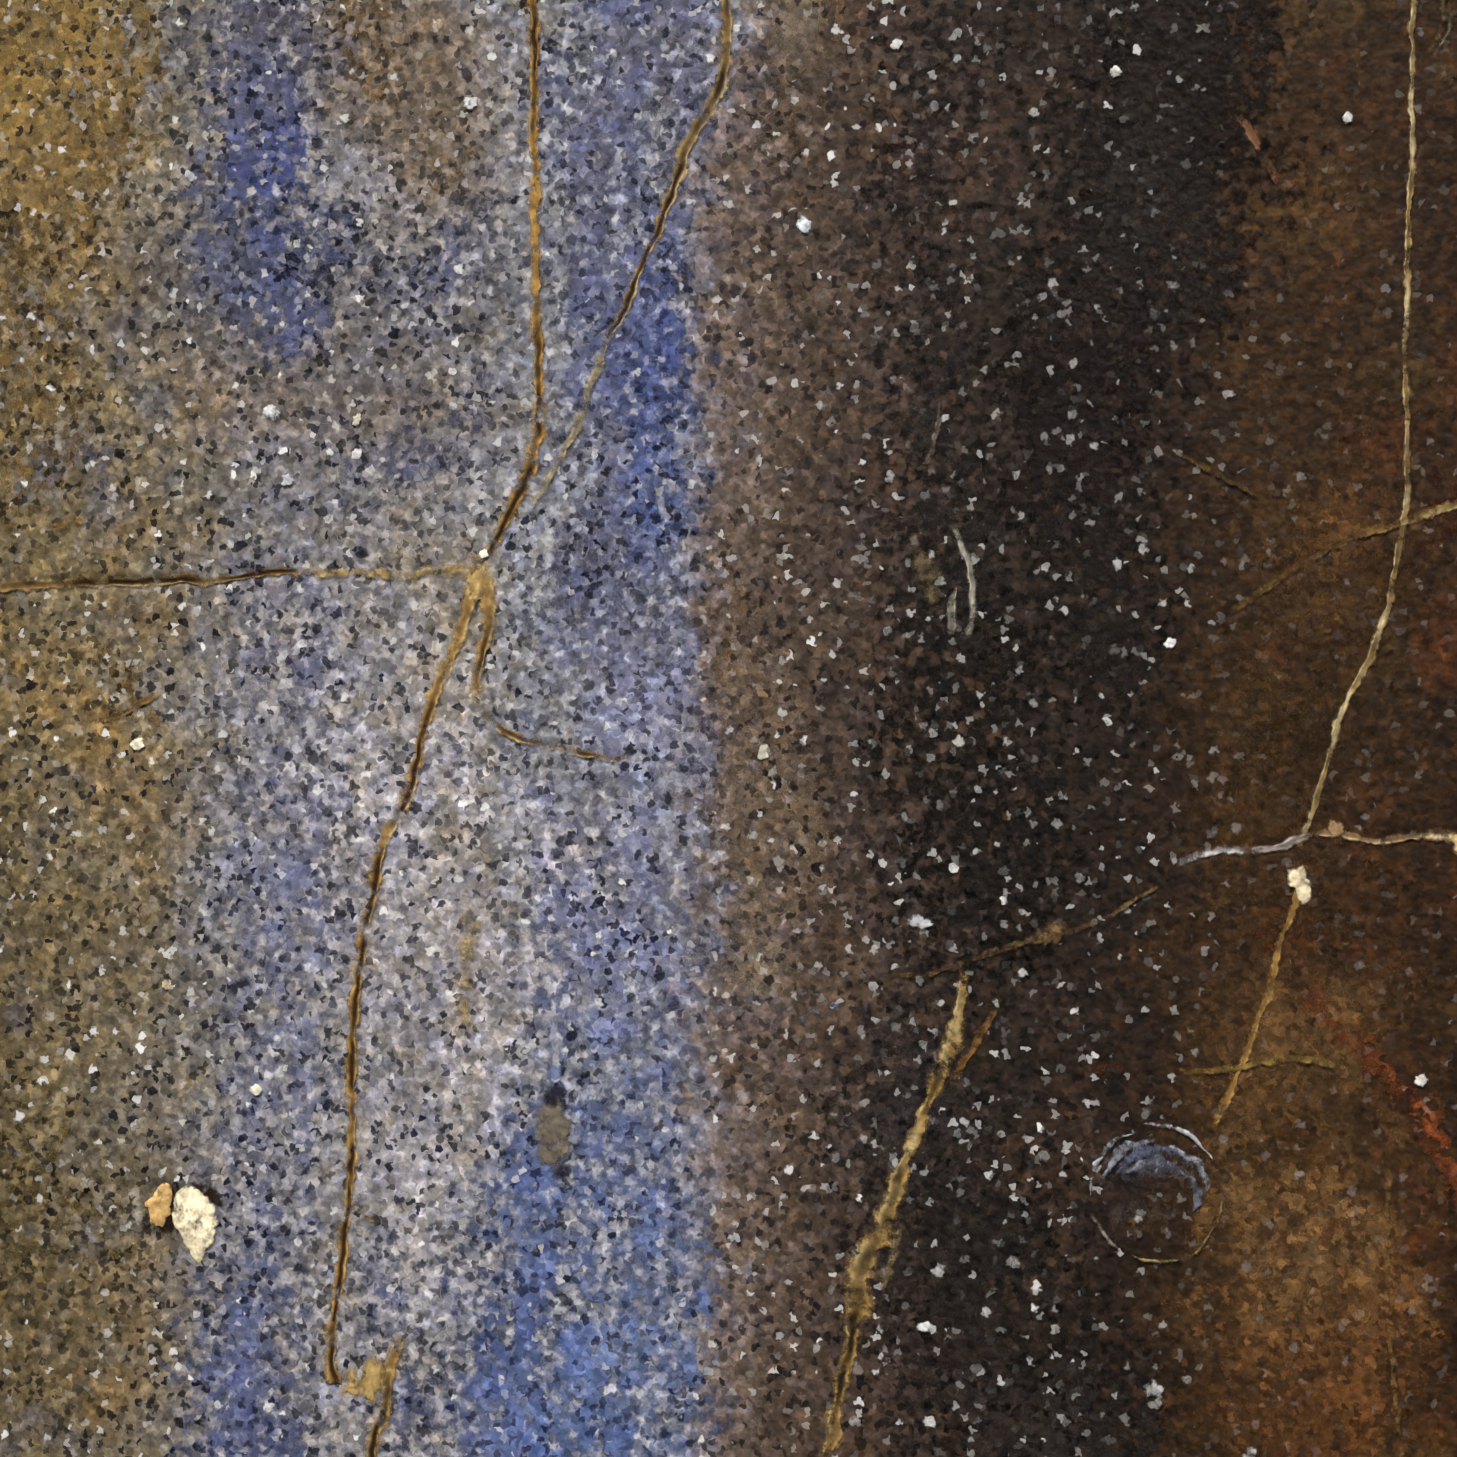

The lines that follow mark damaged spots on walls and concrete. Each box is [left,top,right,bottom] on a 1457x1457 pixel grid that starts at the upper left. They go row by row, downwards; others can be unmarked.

crack [1181,455,1253,495]
crack [1235,0,1457,844]
crack [0,0,733,1383]
crack [1194,890,1337,1125]
corrosion [1164,376,1457,1457]
crack [823,887,1157,1457]
crack [1384,1181,1392,1291]
crack [365,1335,403,1457]
crack [1389,1327,1403,1456]